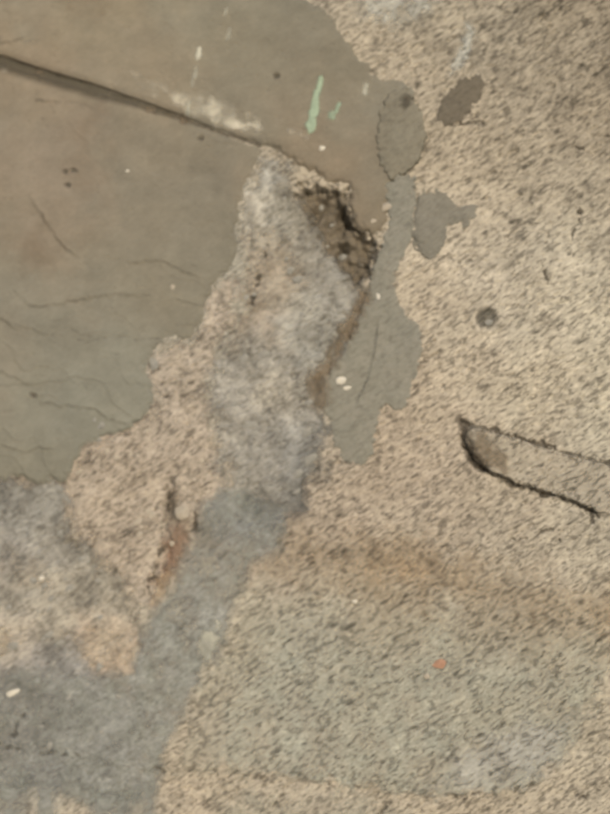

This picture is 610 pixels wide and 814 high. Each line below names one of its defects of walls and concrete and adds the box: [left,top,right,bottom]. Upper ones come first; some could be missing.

spalling [0,161,372,780]
crack [461,424,610,523]
leakage [0,493,282,814]